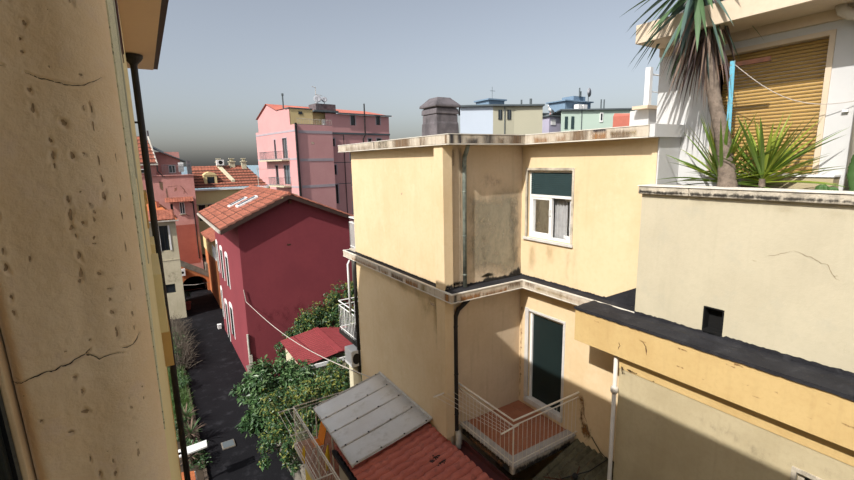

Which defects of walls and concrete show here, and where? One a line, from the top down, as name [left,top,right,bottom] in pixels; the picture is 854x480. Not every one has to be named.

leakage [473,196,541,290]
crack [13,334,139,384]
corrosion [580,397,590,438]